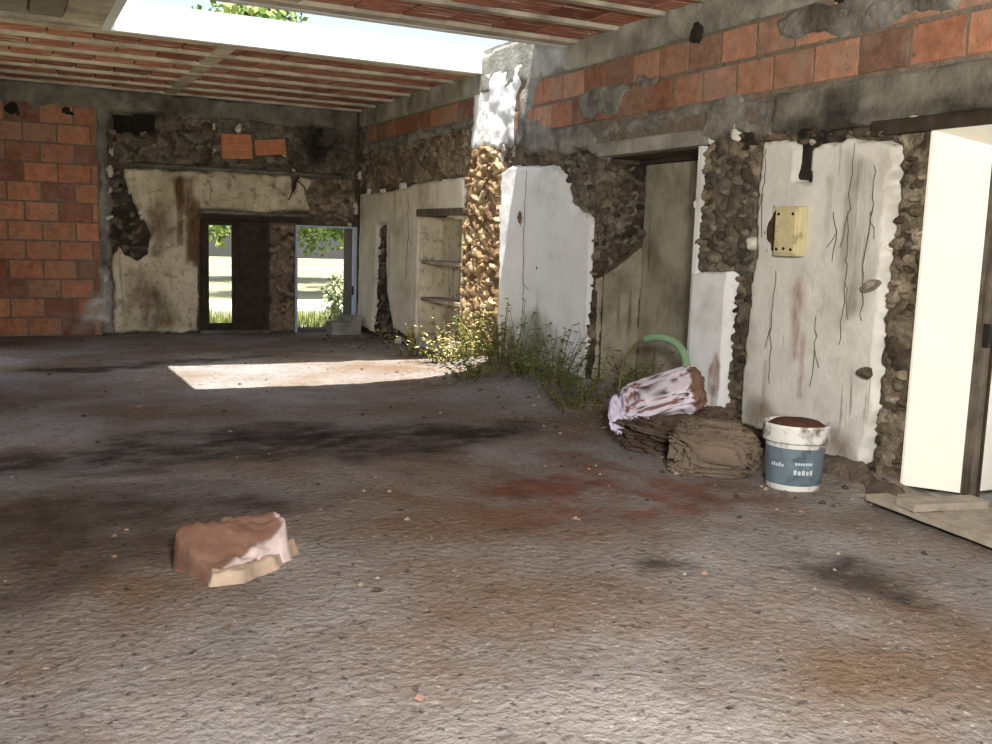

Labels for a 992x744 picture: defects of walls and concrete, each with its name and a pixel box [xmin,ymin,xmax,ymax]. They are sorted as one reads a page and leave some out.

spalling [106,114,646,381]
spalling [693,125,931,481]
crack [809,143,876,387]